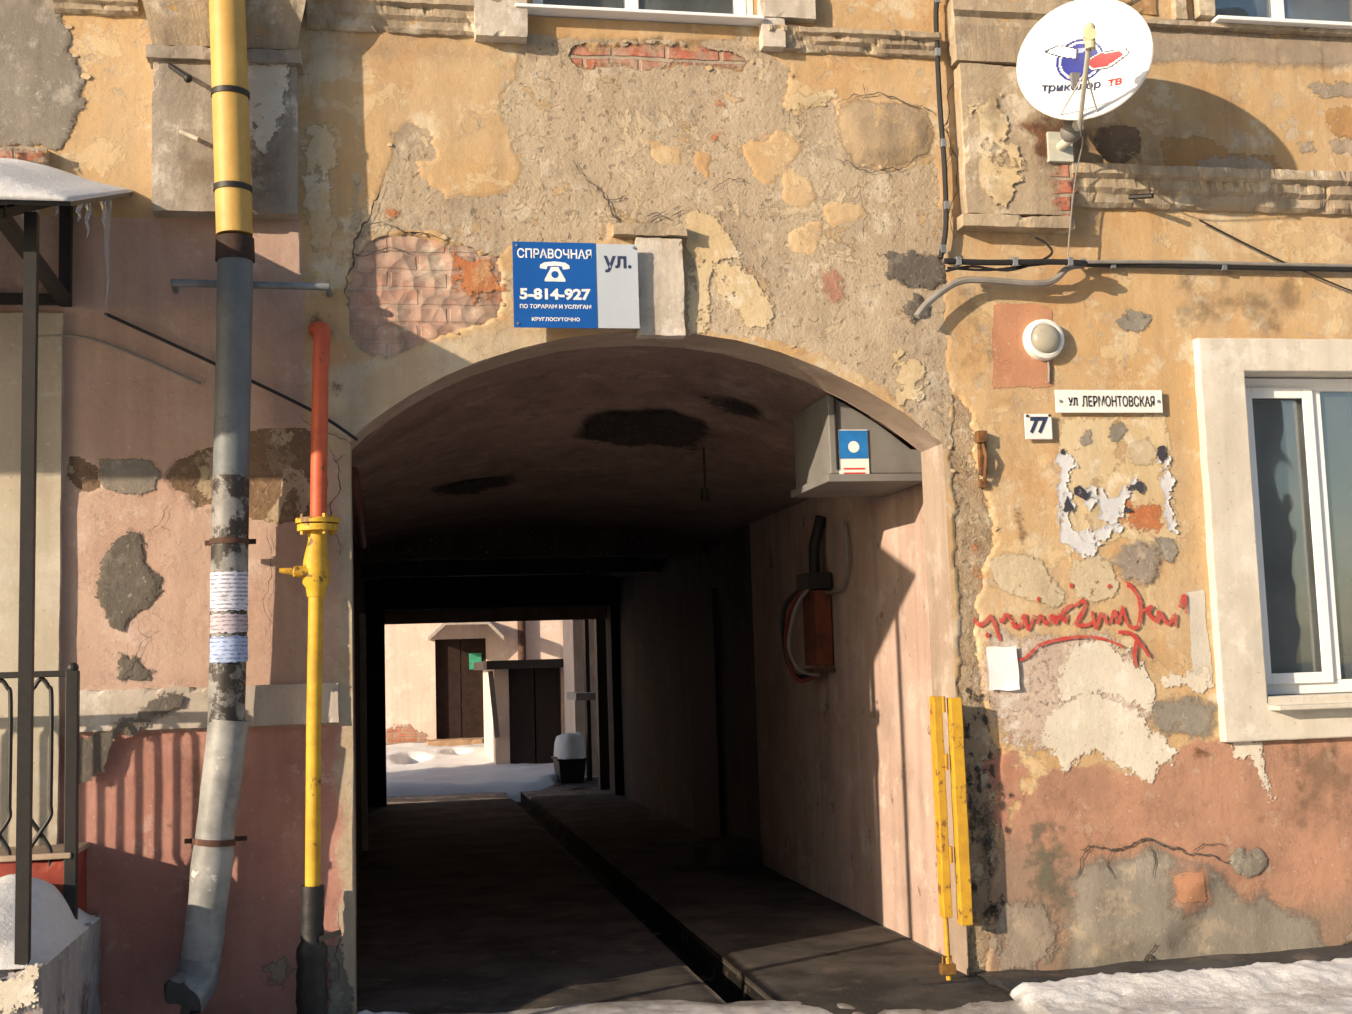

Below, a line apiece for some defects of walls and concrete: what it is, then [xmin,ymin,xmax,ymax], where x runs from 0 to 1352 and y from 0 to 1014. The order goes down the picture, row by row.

peeling [247,63,294,154]
flaking render [66,456,101,492]
flaking render [166,447,213,508]
flaking render [249,428,311,525]
flaking render [299,33,1181,976]
crack [1073,837,1231,880]
peeling [1173,871,1207,903]